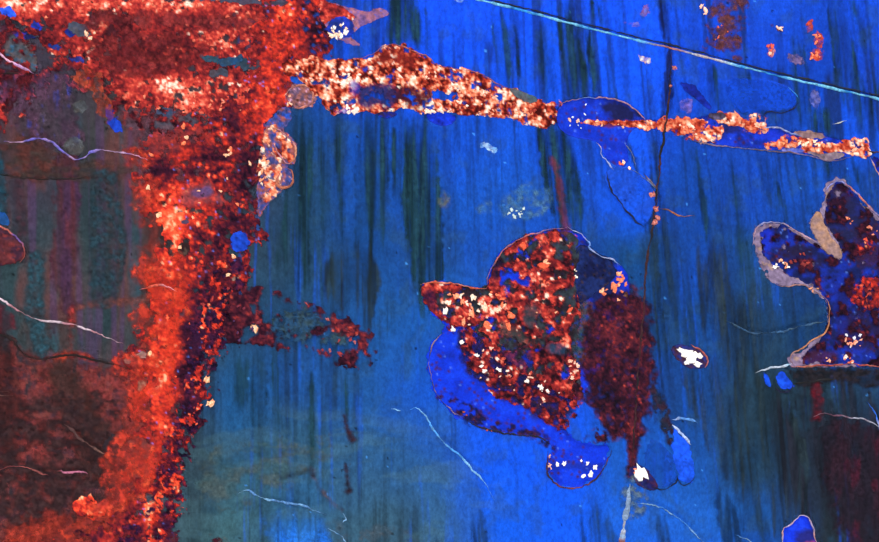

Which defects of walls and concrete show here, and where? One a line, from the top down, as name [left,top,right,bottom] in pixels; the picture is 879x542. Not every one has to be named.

crack [0,138,146,180]
corrosion [632,111,879,161]
corrosion [559,183,567,235]
crack [0,298,121,343]
corrosion [0,0,563,542]
peeling [421,227,631,489]
corrosion [567,285,674,478]
crack [619,53,703,542]
peeling [671,344,709,369]
peeling [753,176,879,393]
crack [395,407,493,497]
peeling [628,417,697,491]